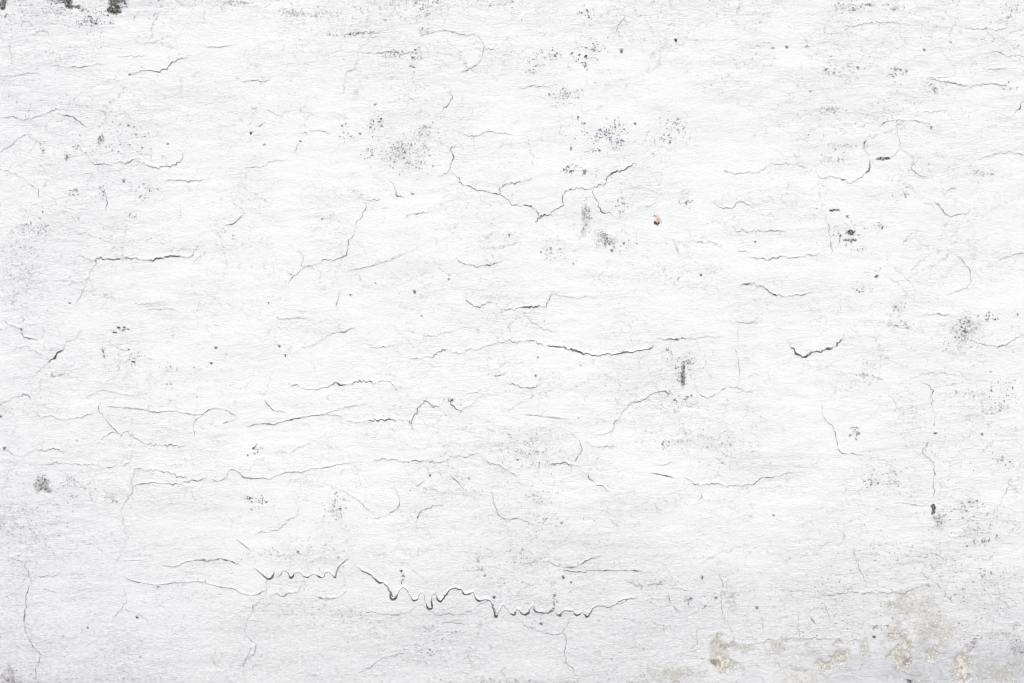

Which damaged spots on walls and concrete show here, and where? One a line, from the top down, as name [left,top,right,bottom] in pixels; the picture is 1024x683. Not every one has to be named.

crack [441,91,637,223]
crack [789,338,843,358]
crack [277,290,759,492]
crack [0,240,207,622]
crack [366,567,487,616]
peeling [710,633,790,676]
peeling [881,633,941,683]